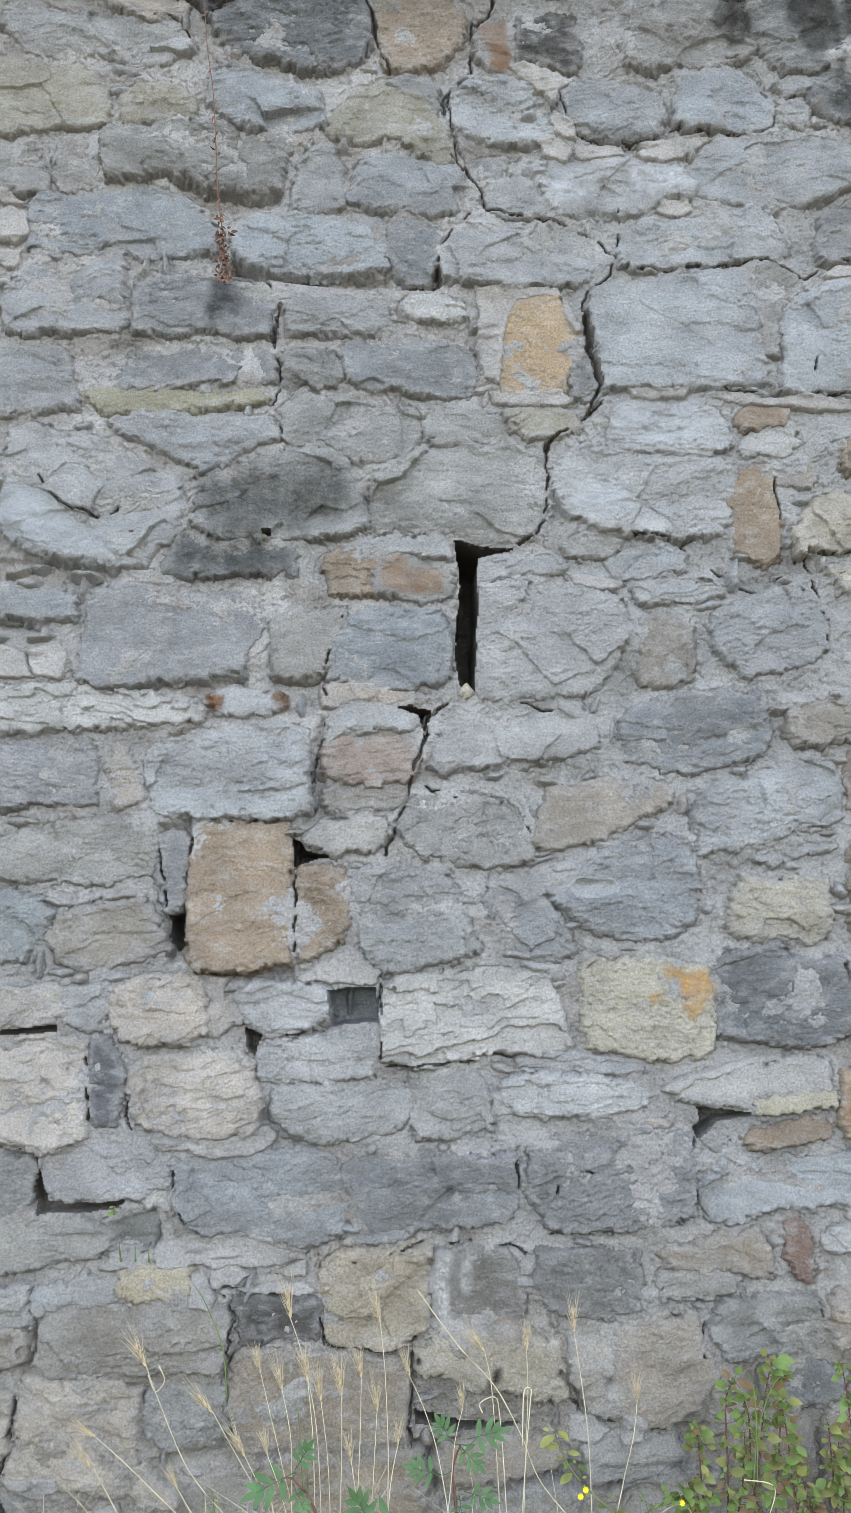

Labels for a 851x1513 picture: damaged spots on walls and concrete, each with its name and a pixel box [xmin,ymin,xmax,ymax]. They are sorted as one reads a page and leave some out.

crack [411,0,849,546]
crack [632,531,851,598]